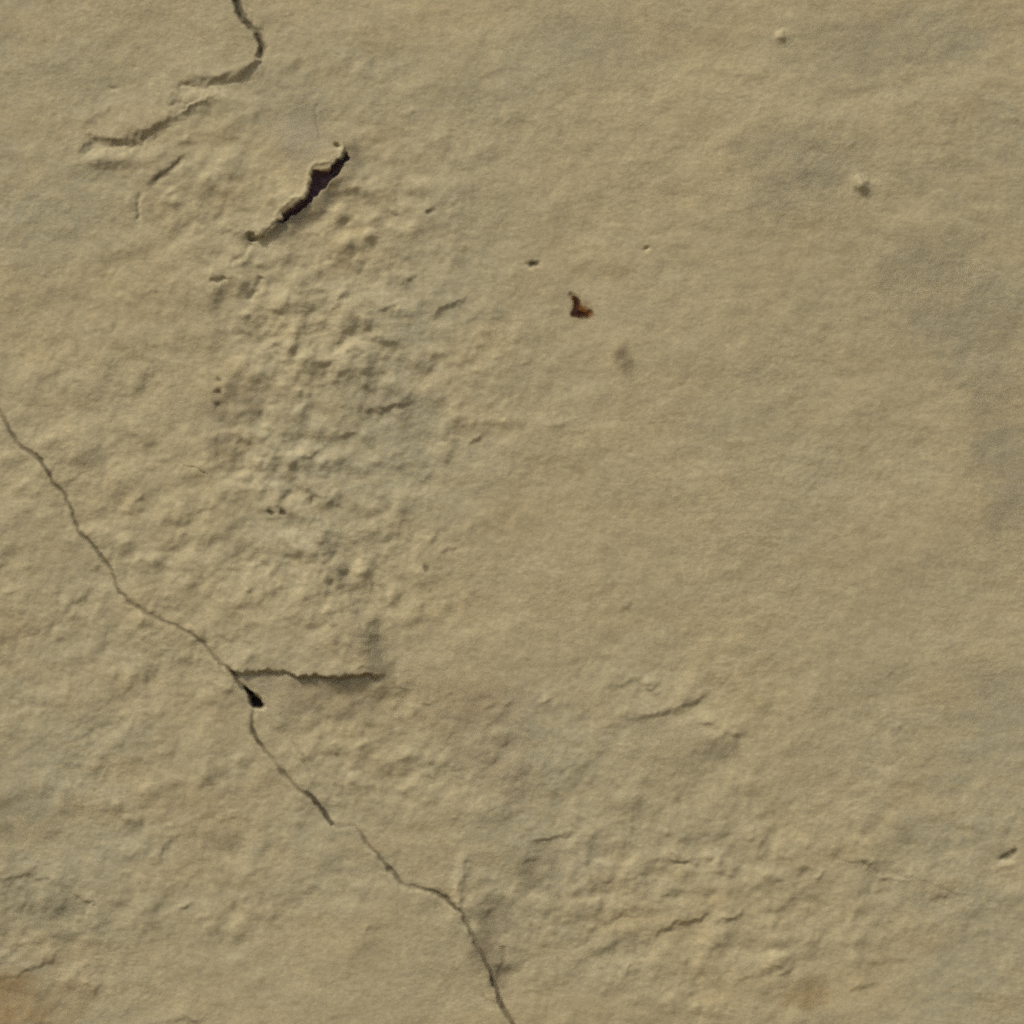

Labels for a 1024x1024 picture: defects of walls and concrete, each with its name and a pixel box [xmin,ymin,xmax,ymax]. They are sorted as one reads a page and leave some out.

corrosion [571,296,593,317]
spalling [177,116,502,733]
crack [304,792,332,824]